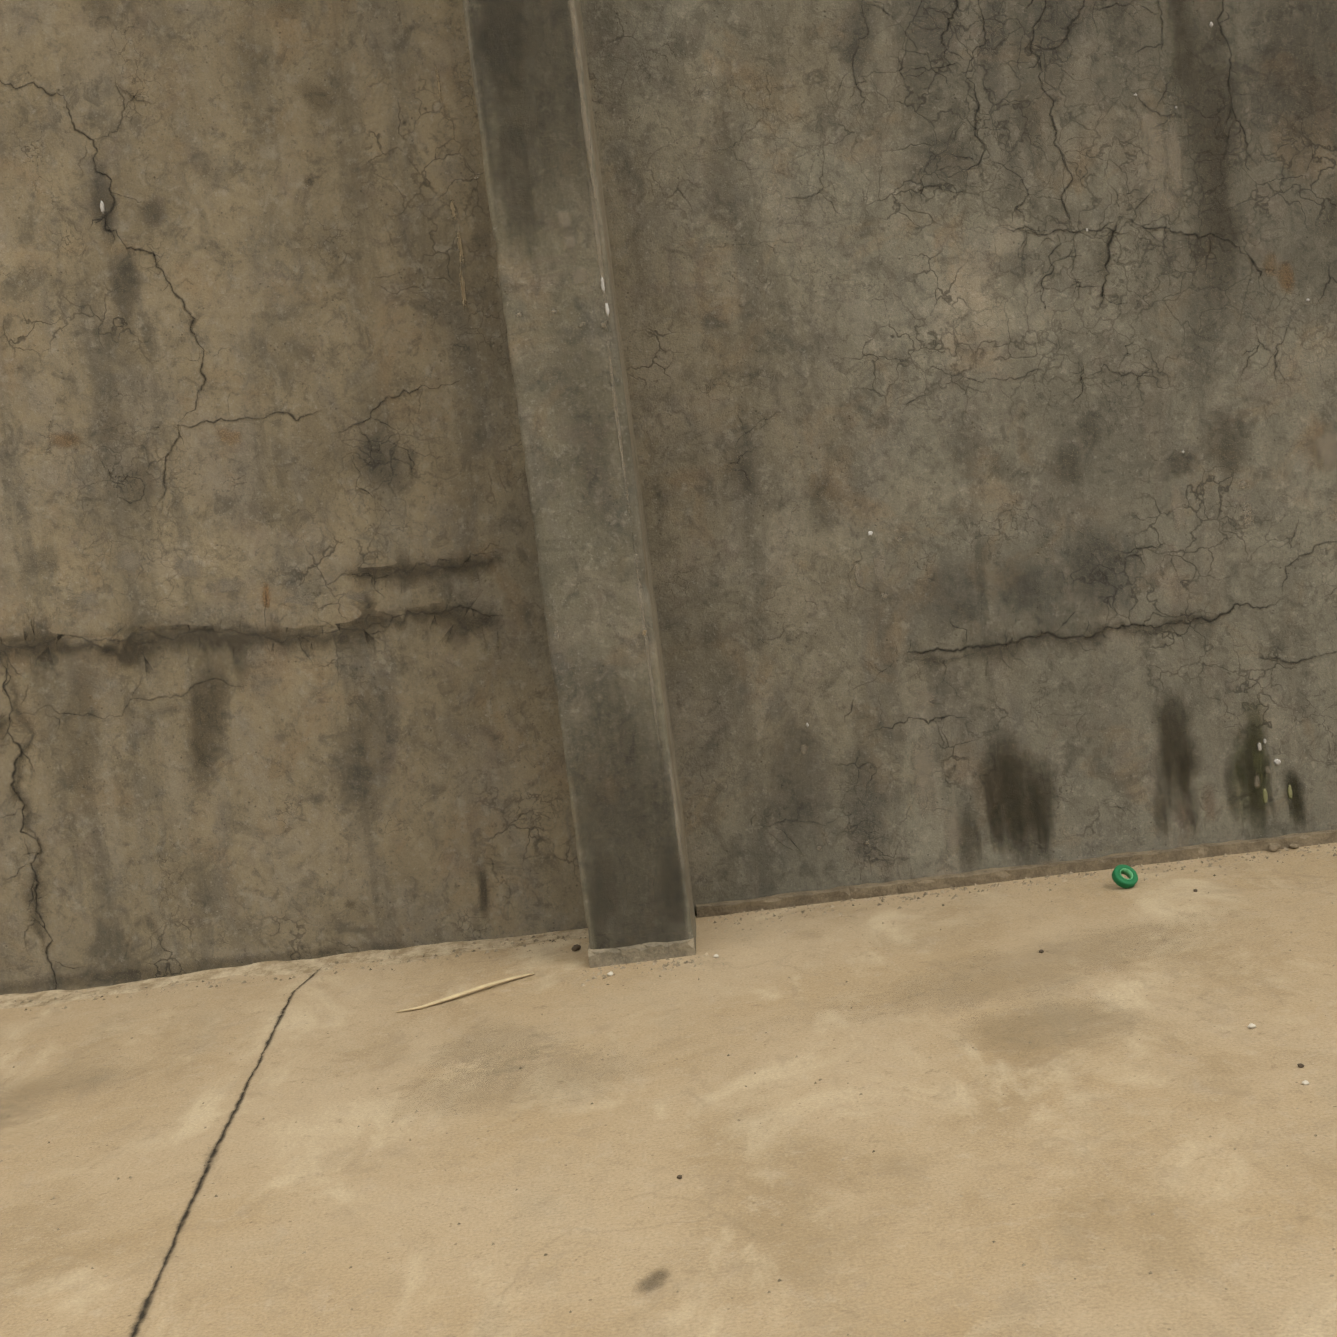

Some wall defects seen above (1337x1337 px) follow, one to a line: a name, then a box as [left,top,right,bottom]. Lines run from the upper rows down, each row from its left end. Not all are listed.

crack [0,80,310,495]
crack [354,381,458,426]
crack [1073,344,1144,402]
crack [1242,329,1287,380]
crack [910,541,1337,660]
crack [1274,651,1337,664]
crack [0,559,492,982]
water stain [1162,707,1193,782]
water stain [1242,719,1265,817]
water stain [1288,776,1303,821]